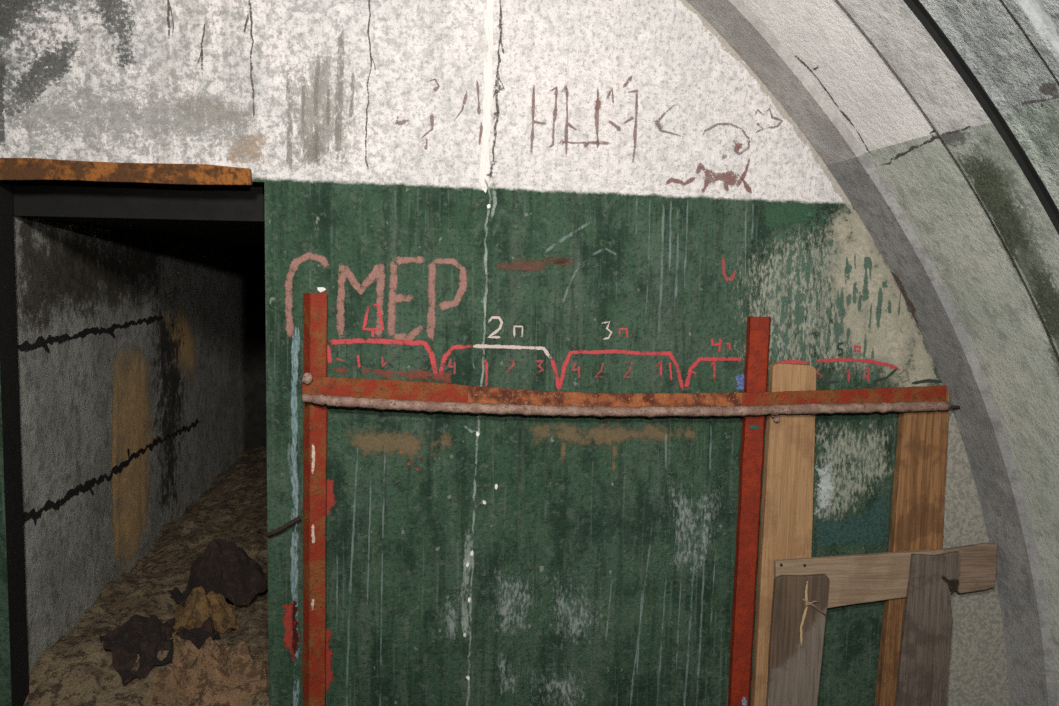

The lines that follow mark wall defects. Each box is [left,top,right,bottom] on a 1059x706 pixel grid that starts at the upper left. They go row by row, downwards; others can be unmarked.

leakage [0,0,255,152]
crack [244,1,255,117]
leakage [286,35,354,169]
crack [479,0,504,190]
peeling [737,201,941,390]
rust [348,428,452,471]
rust [531,421,695,471]
leakage [676,498,710,570]